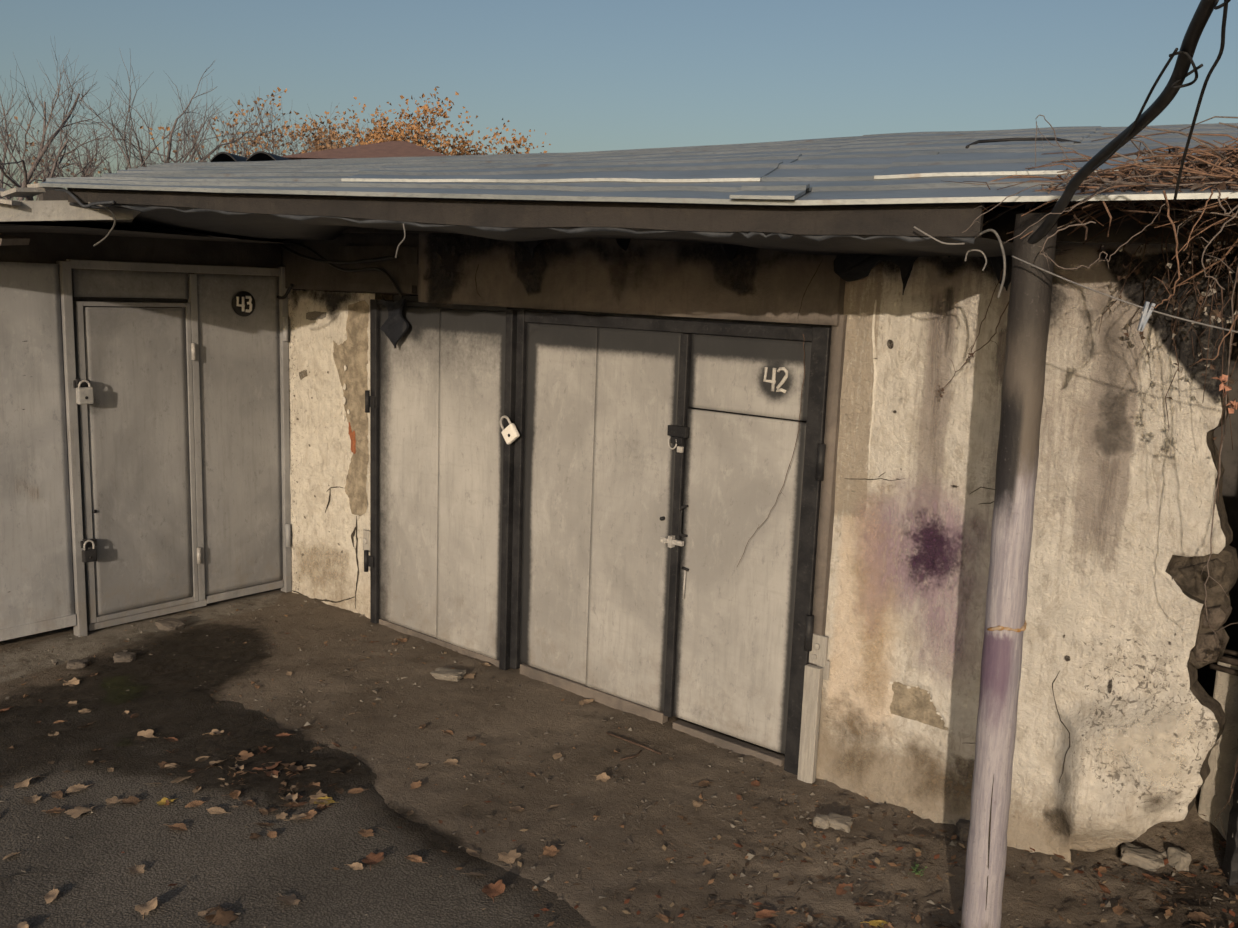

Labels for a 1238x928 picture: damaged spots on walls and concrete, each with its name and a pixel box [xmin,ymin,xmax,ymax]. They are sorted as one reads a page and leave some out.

leakage [510,240,547,295]
leakage [702,243,756,295]
spalling [327,300,369,520]
crack [292,487,359,608]
spalling [1168,545,1238,669]
peeling [890,680,952,732]
leakage [916,749,974,806]